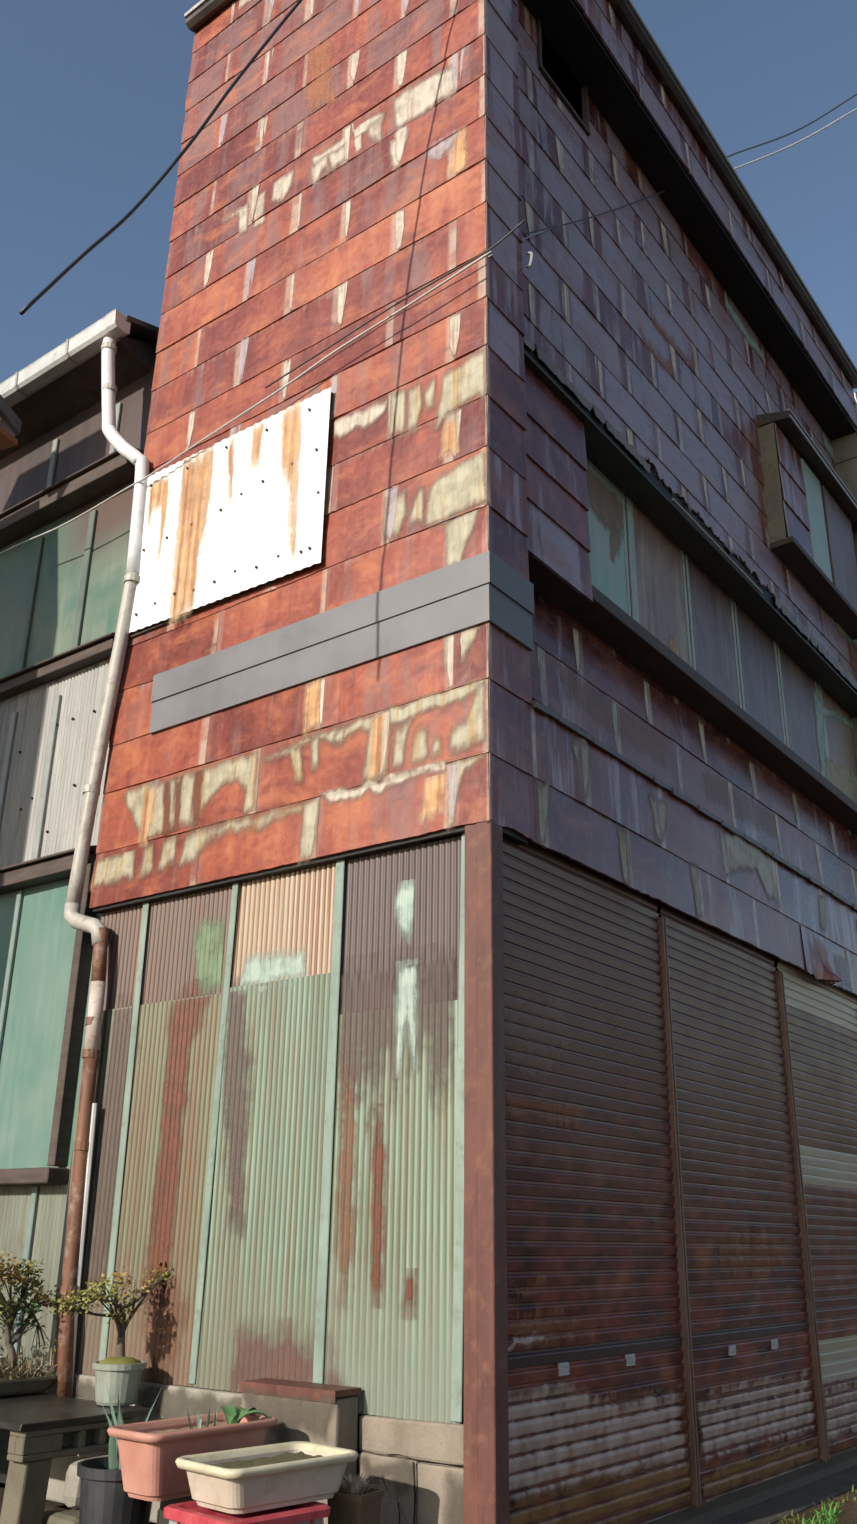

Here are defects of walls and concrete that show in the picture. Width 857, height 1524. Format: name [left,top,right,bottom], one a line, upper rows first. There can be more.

peeling [221,67,455,234]
rust [149,438,234,622]
rust [251,424,263,466]
rust [281,404,301,553]
peeling [334,347,487,438]
peeling [383,452,487,566]
peeling [91,677,486,890]
peeling [814,691,857,804]
rust [89,1003,133,1285]
rust [143,978,209,1384]
rust [224,983,250,1233]
rust [336,950,454,1292]